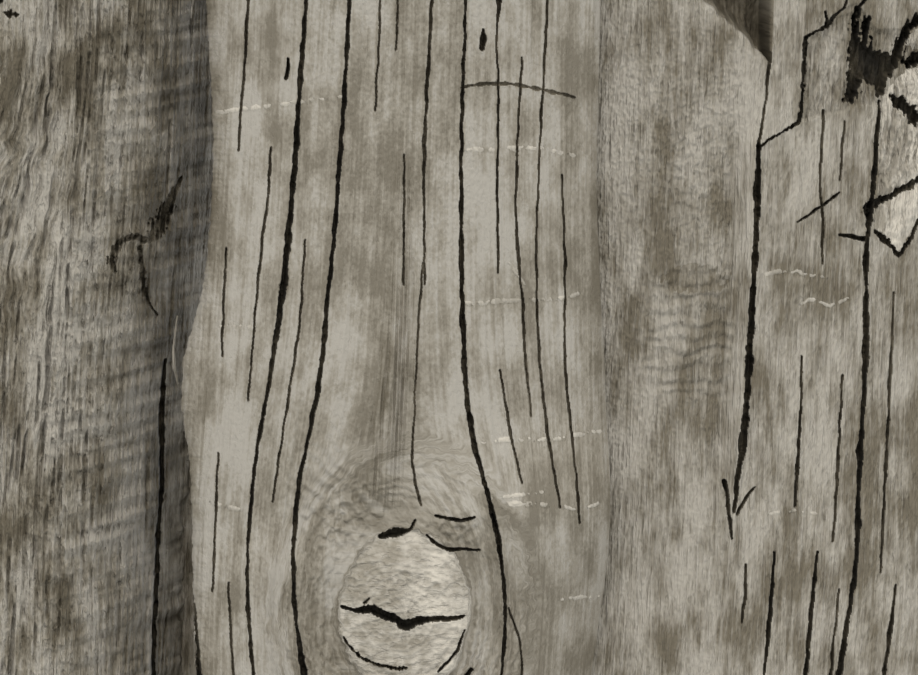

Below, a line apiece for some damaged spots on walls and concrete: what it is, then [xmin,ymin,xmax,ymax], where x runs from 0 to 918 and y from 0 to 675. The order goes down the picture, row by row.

crack [151,358,167,675]
crack [193,0,352,675]
crack [374,0,399,111]
crack [340,597,474,675]
crack [378,0,581,675]
crack [722,0,918,675]